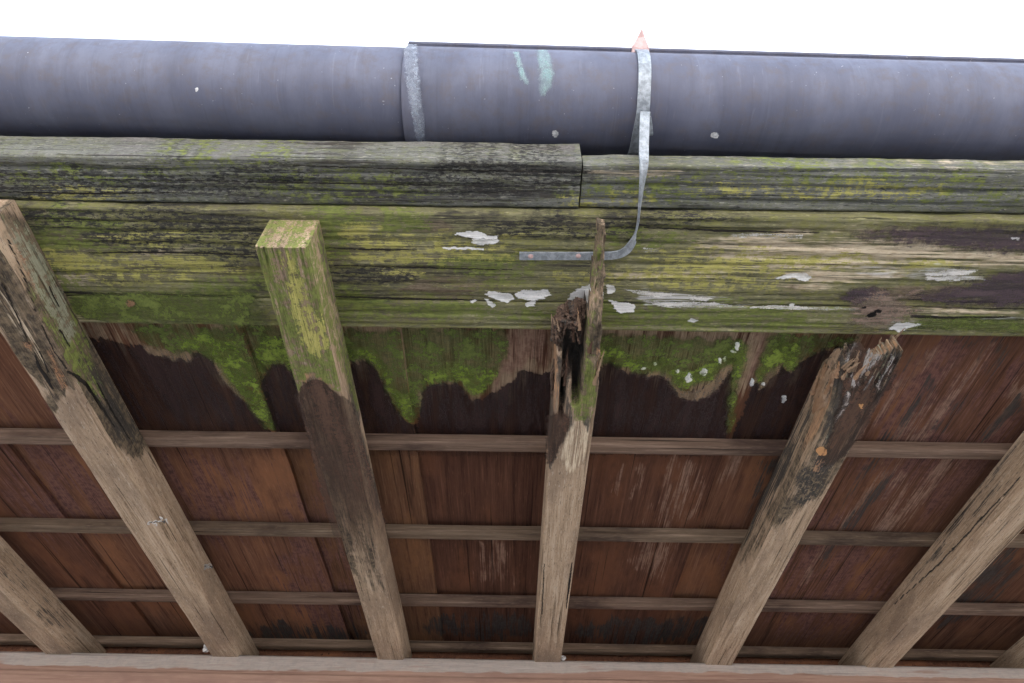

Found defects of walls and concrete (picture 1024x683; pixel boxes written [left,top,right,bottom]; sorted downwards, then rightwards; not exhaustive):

peeling [442,231,499,250]
damp [855,222,1024,255]
peeling [470,289,551,308]
peeling [568,284,591,302]
peeling [606,284,727,313]
peeling [776,273,811,281]
damp [839,286,890,306]
peeling [920,269,976,282]
damp [906,271,1024,310]
damp [592,341,900,462]
damp [89,337,570,534]
crack [895,477,1020,604]